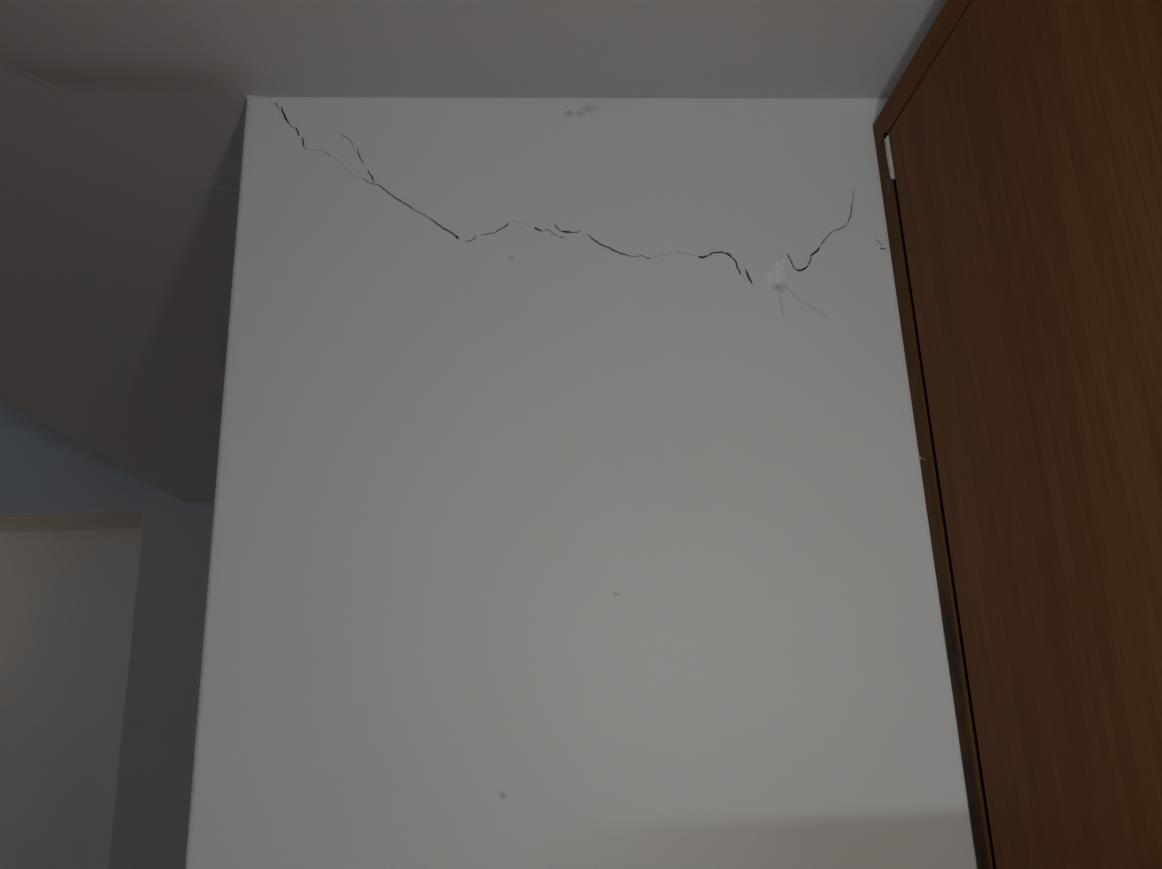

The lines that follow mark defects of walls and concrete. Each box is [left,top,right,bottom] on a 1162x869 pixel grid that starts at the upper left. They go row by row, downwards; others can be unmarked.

crack [268,97,753,284]
crack [786,191,855,271]